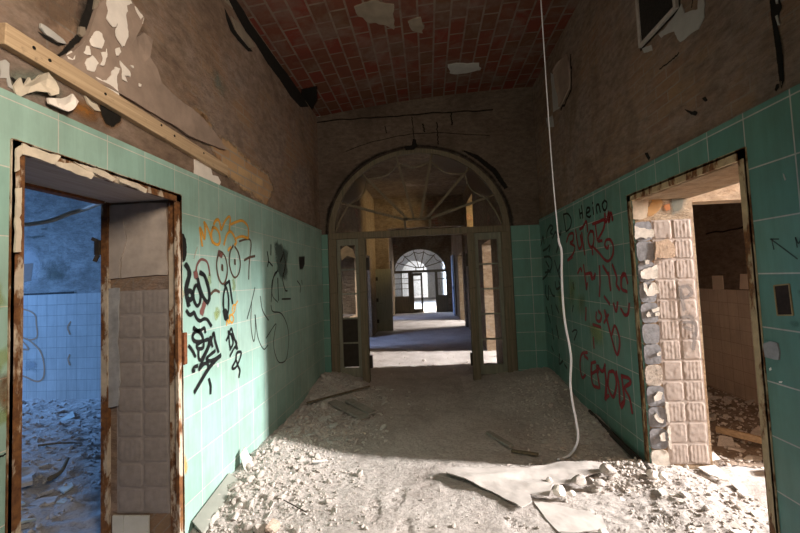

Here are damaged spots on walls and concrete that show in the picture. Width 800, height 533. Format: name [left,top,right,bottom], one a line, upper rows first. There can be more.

peeling [658,0,705,42]
peeling [0,60,101,112]
peeling [38,0,274,206]
peeling [14,143,147,193]
peeling [13,188,37,282]
peeling [108,203,170,513]
peeling [634,219,710,466]